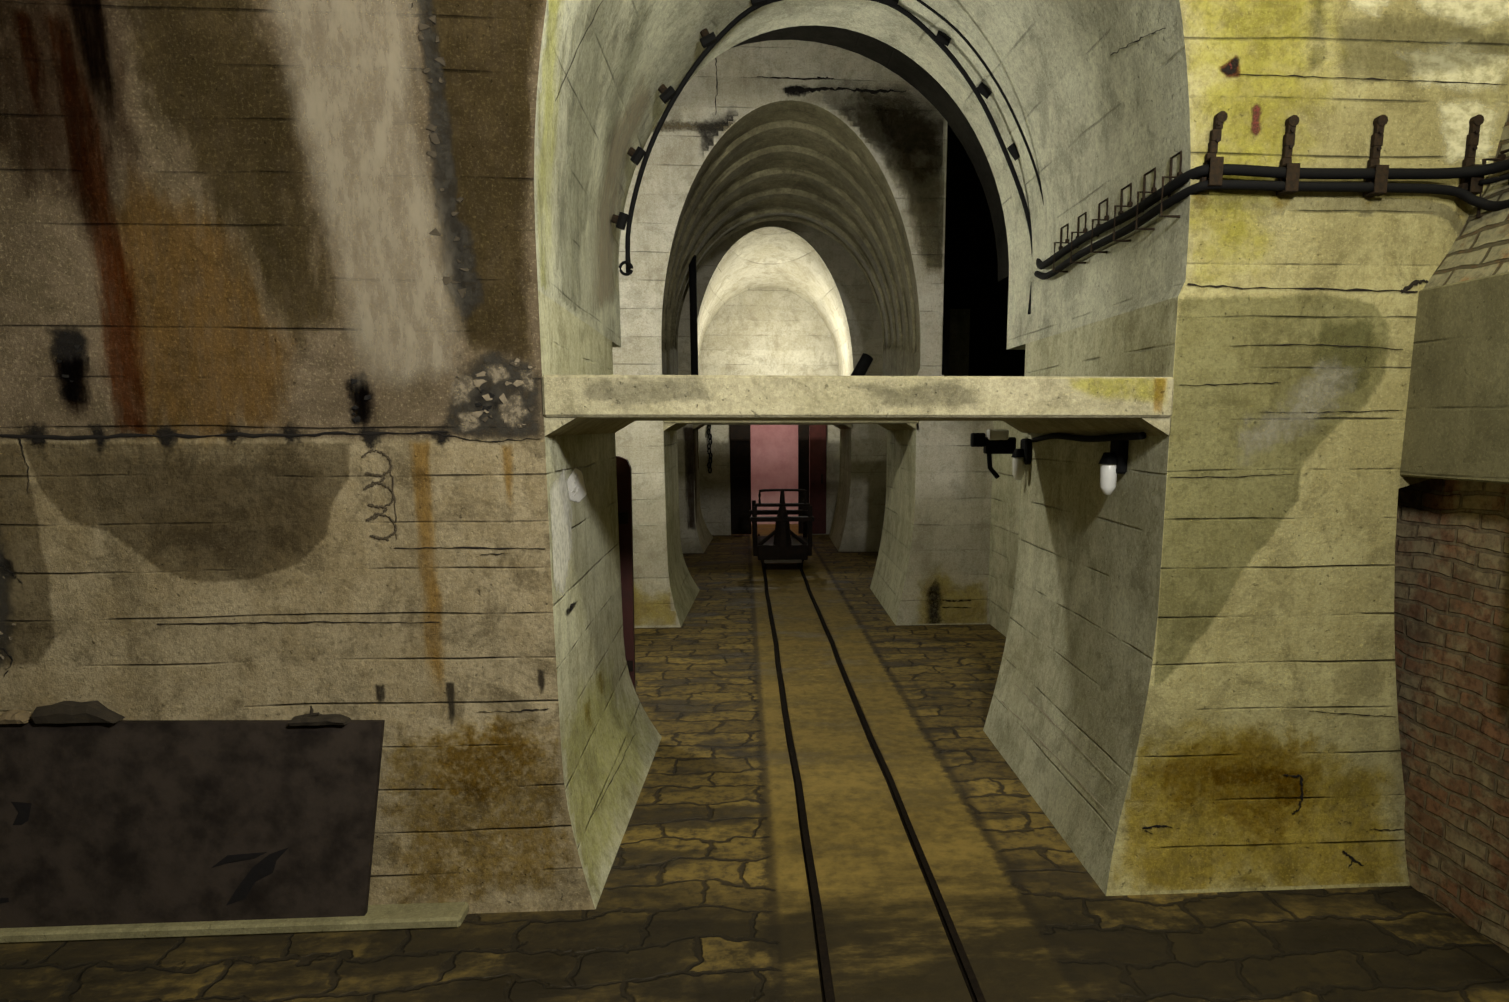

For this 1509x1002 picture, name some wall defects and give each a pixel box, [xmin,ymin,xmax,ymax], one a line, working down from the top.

damp [0,0,125,215]
damp [279,0,482,375]
peeling [448,352,539,438]
crack [0,431,532,493]
crack [394,546,546,555]
crack [157,619,440,627]
damp [928,584,941,624]